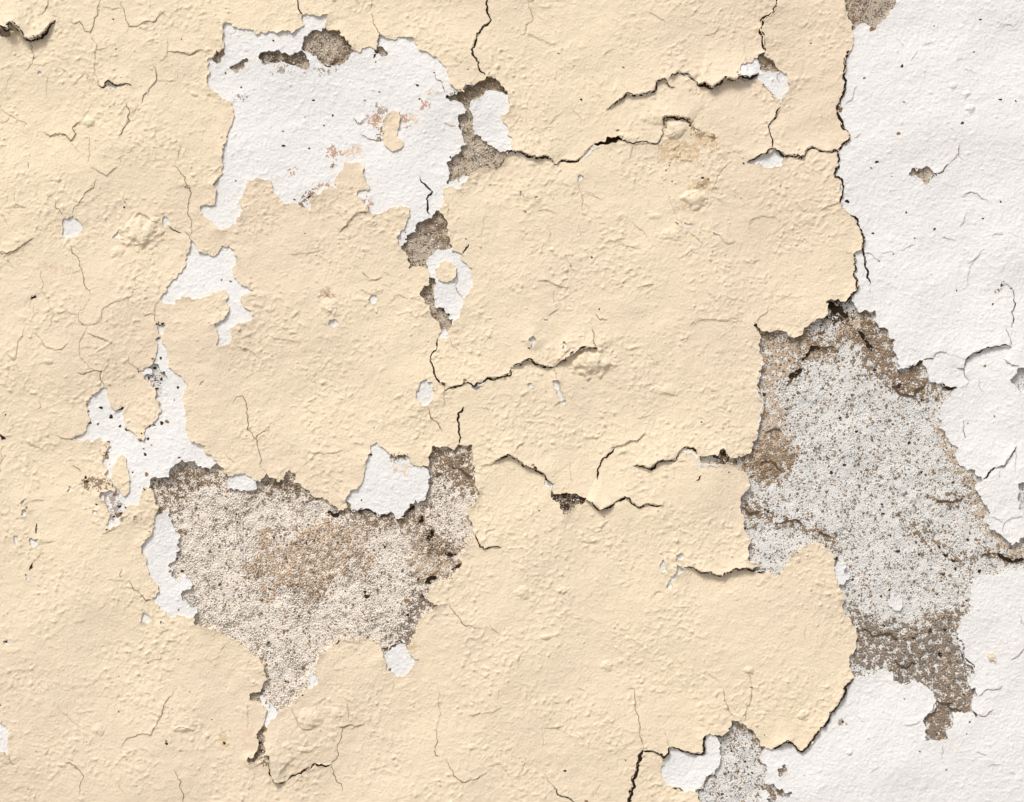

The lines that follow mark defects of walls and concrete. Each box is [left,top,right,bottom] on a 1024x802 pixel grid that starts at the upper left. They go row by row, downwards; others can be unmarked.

peeling [161,240,254,346]
spalling [71,321,480,767]
peeling [200,14,512,338]
crack [586,416,701,532]
crack [506,0,912,351]
crack [725,460,782,472]
crack [786,345,835,386]
peeling [660,0,1024,802]